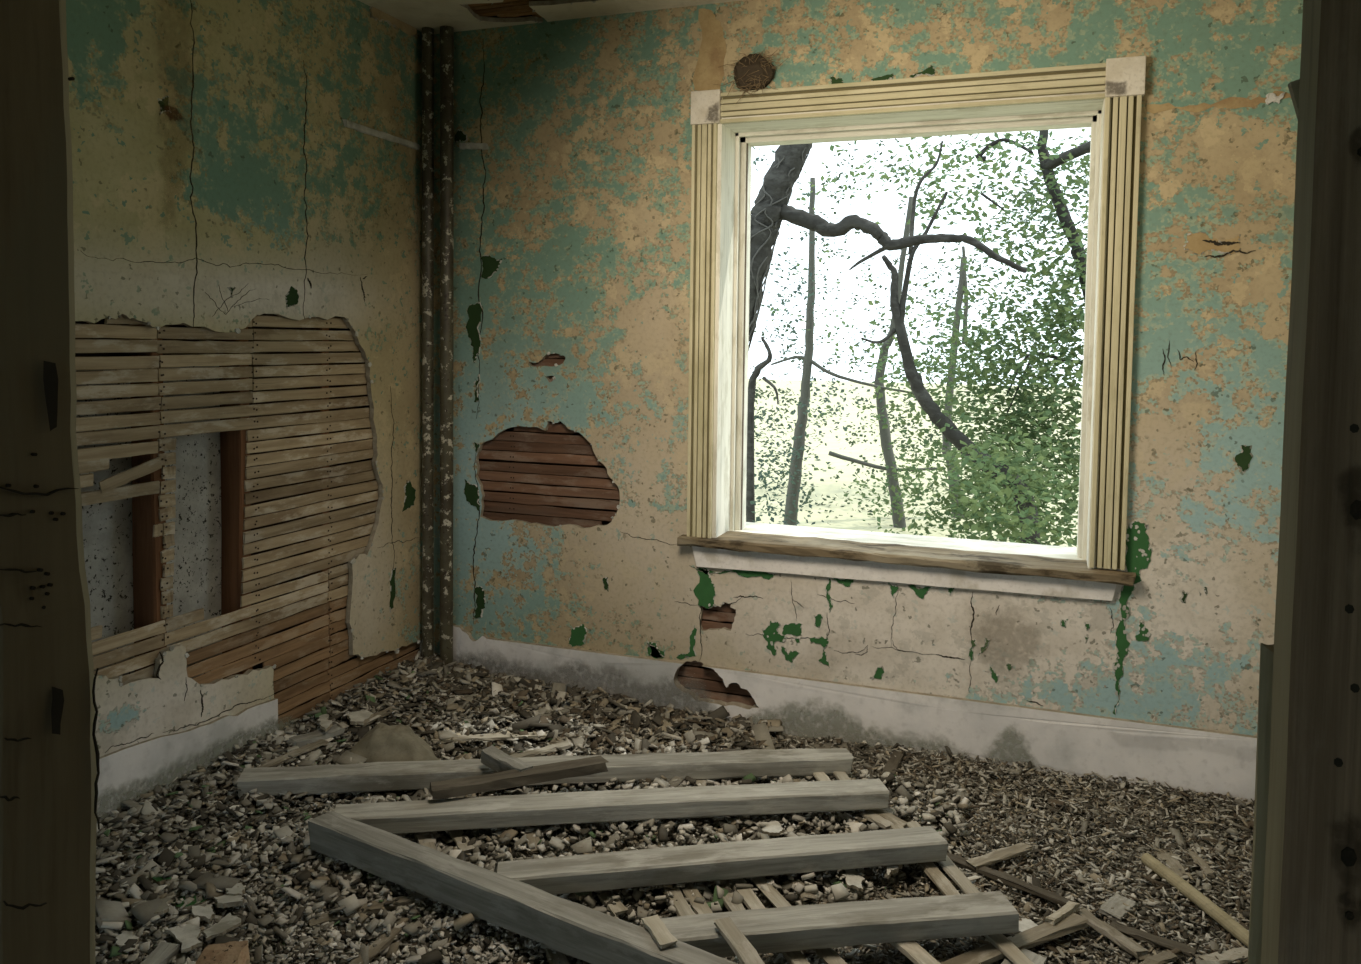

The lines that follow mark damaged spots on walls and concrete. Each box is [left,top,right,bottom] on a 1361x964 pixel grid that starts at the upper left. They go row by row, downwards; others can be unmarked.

flaking render [468,0,550,23]
crack [80,0,367,327]
peeling [466,302,482,402]
flaking render [531,352,565,382]
flaking render [75,286,422,725]
flaking render [464,422,620,528]
peeling [569,624,587,647]
flaking render [646,565,776,706]
crack [675,582,1000,693]
peeling [888,583,954,599]
peeling [1112,520,1152,715]
crack [105,651,274,753]